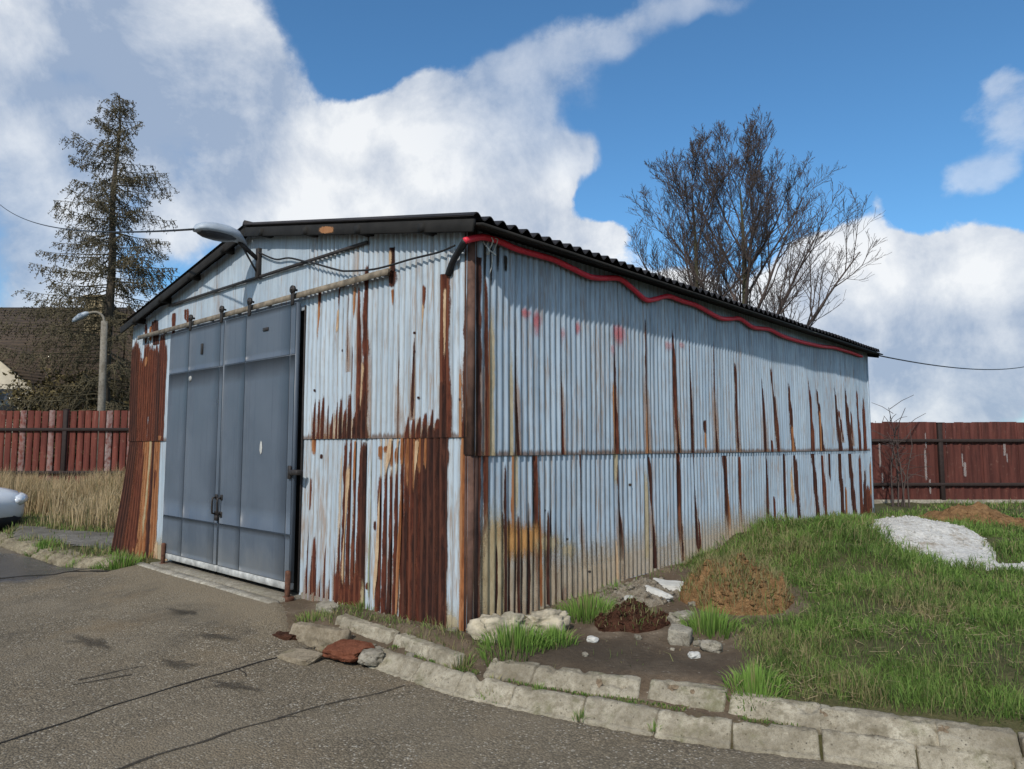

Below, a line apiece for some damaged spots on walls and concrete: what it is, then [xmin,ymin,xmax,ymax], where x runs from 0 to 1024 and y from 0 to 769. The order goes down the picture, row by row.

corrosion [389,247,397,305]
corrosion [111,309,189,559]
corrosion [305,257,603,633]
corrosion [612,320,657,580]
corrosion [672,333,742,561]
corrosion [761,370,801,518]